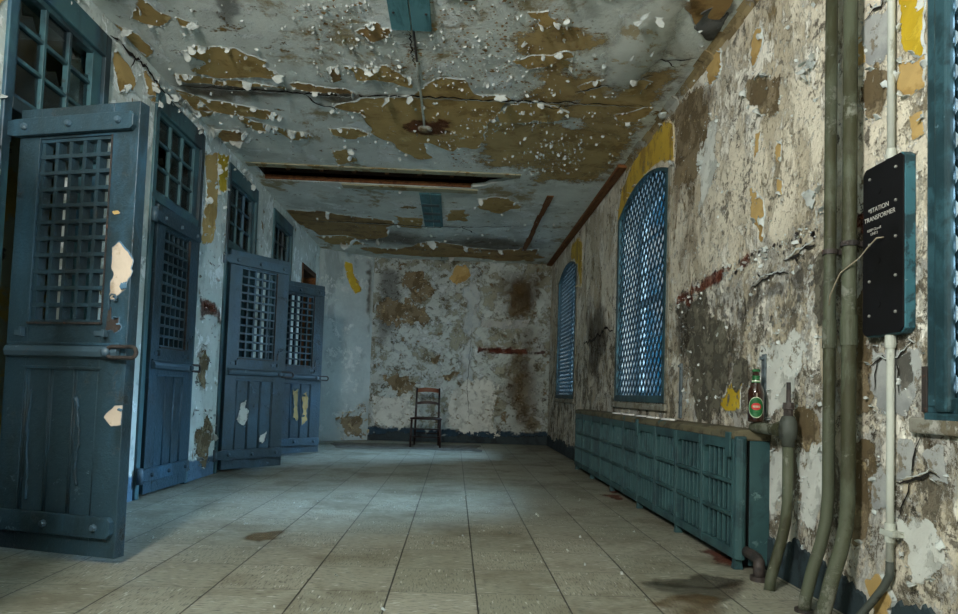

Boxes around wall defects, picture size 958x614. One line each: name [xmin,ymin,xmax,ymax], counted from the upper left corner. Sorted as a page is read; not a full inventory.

crack [110,32,646,110]
crack [637,48,711,80]
flaking render [858,0,927,123]
peeling [112,0,653,288]
peeling [109,241,134,300]
peeling [286,196,555,452]
leakage [509,362,530,422]
leakage [509,283,533,315]
leakage [678,290,748,424]
rust [675,228,818,307]
leakage [813,251,824,326]
crack [896,437,940,519]